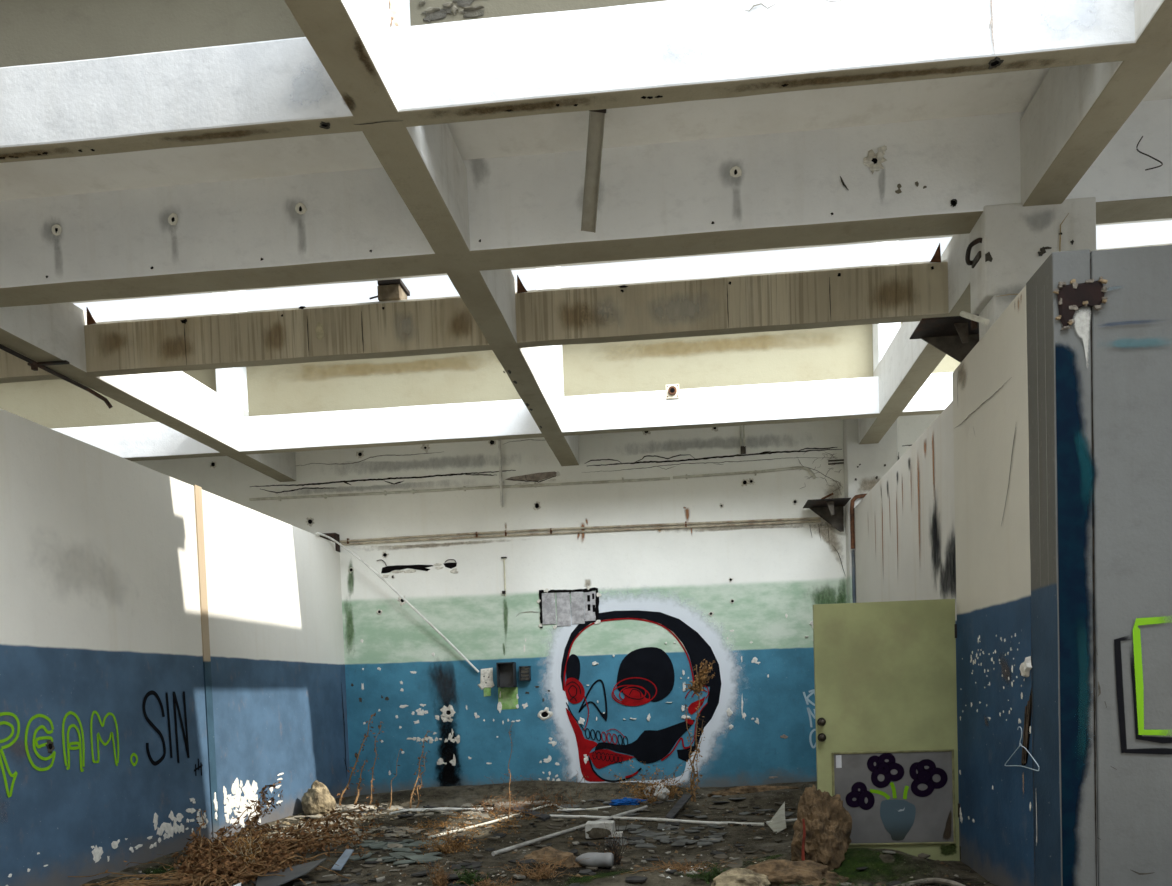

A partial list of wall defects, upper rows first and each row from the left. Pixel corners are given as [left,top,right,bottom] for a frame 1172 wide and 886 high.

peeling [419,0,485,23]
spalling [1053,276,1108,362]
rust [875,468,920,559]
water stain [815,589,837,604]
peeling [378,668,553,766]
peeling [539,737,560,781]
spalling [962,633,1032,765]
peeling [91,773,284,863]